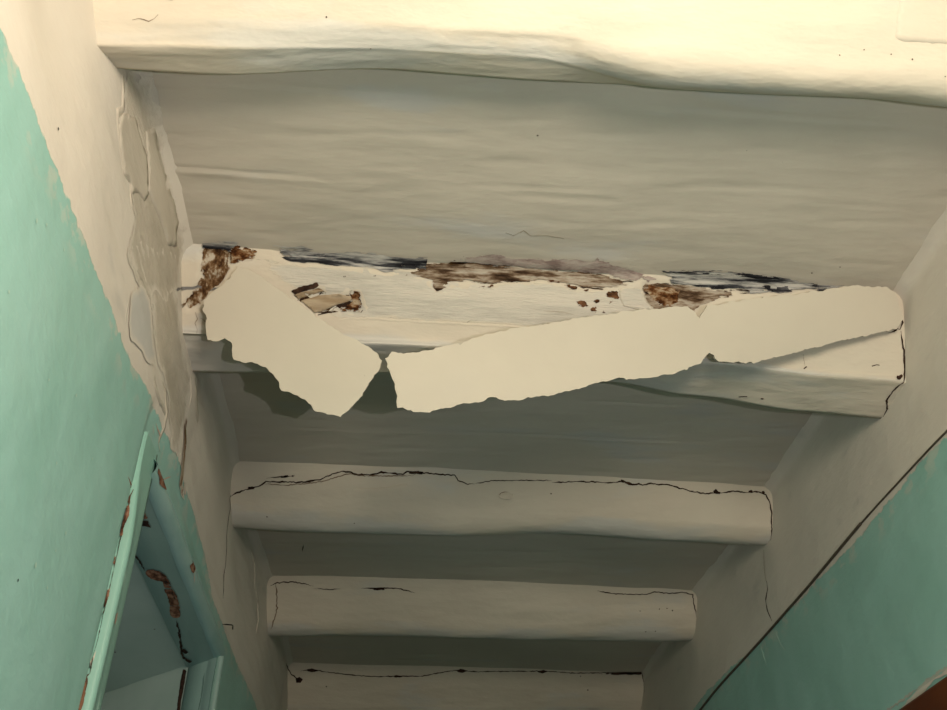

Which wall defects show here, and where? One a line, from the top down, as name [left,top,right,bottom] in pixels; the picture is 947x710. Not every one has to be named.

peeling [117,71,190,455]
water stain [202,241,238,252]
water stain [273,245,427,272]
peeling [202,259,903,417]
crack [223,471,772,594]
crack [600,591,697,617]
crack [286,663,644,683]